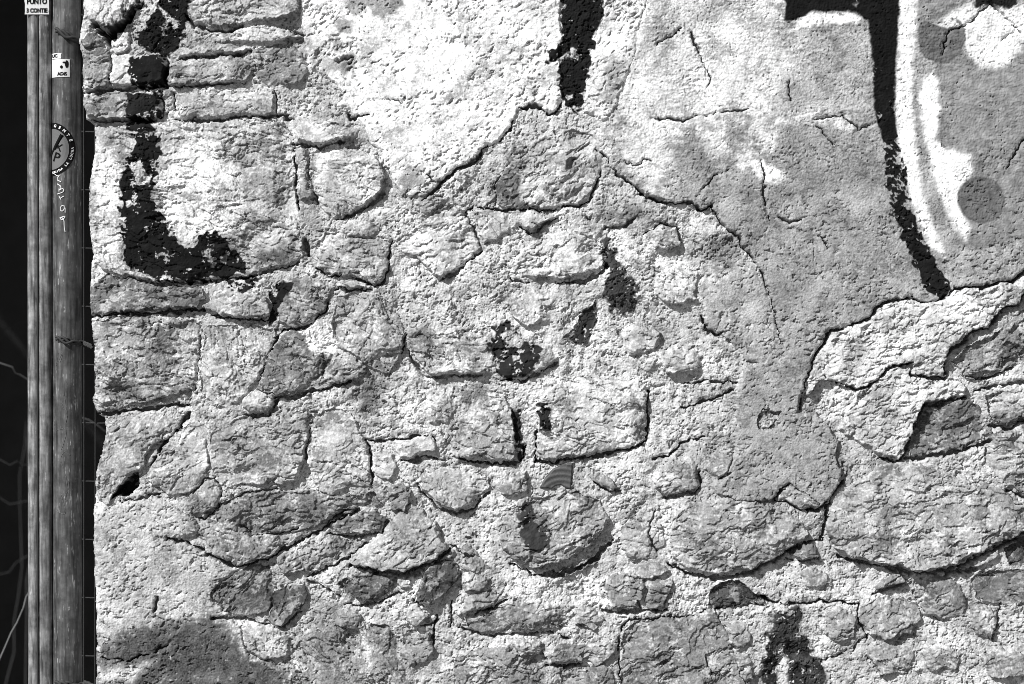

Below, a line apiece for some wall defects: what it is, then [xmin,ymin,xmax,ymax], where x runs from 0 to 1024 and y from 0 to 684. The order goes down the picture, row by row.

crack [656,28,712,87]
crack [422,102,562,201]
crack [655,108,750,123]
crack [814,115,872,146]
crack [761,163,829,250]
crack [466,149,784,343]
crack [680,379,738,410]
spalling [757,409,782,430]
crack [798,270,1024,464]
flaking render [805,276,1024,460]
spalling [111,472,141,500]